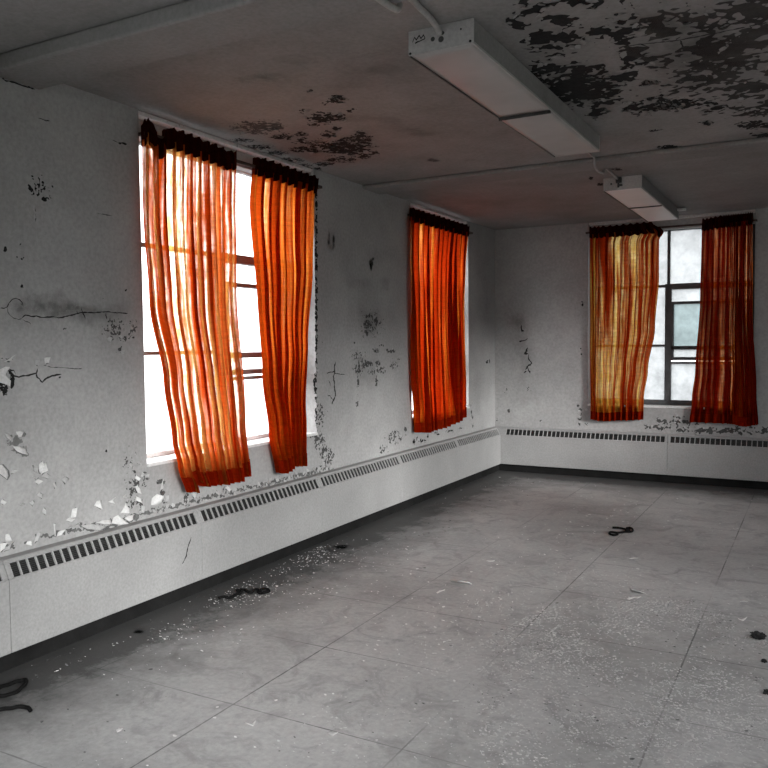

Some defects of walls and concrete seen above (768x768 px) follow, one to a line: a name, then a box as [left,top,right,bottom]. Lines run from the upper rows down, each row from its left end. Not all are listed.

peeling [502,0,768,138]
flaking render [230,138,314,169]
crack [2,298,128,323]
crack [11,365,81,383]
flaking render [20,194,335,546]
crack [327,362,345,404]
flaking render [351,309,400,407]
crack [519,325,532,373]
peeling [644,414,768,436]
peeling [4,431,29,457]
peeling [0,533,15,553]